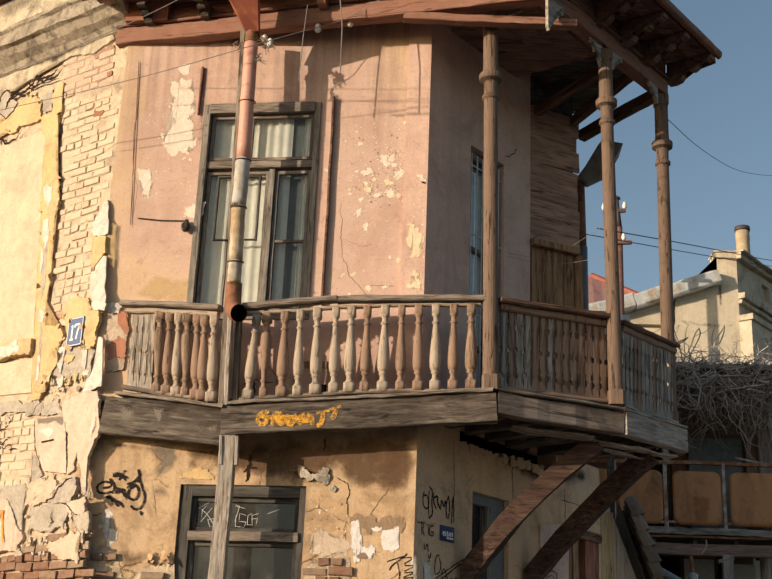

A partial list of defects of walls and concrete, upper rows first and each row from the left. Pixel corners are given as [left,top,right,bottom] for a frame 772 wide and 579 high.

flaking render [0,91,19,118]
crack [0,66,64,201]
flaking render [40,36,118,326]
peeling [137,157,165,200]
peeling [156,64,203,163]
peeling [179,202,206,223]
peeling [343,115,425,294]
flaking render [0,310,175,579]
flaking render [302,503,406,579]